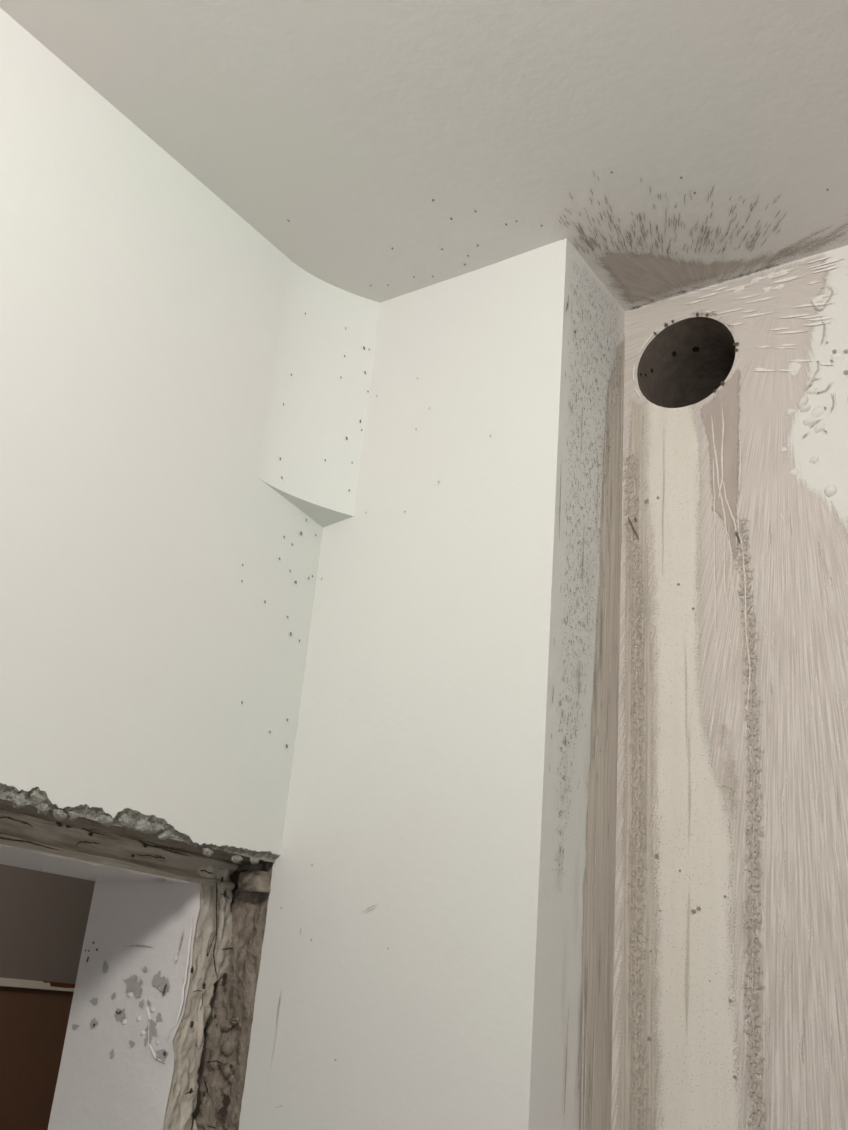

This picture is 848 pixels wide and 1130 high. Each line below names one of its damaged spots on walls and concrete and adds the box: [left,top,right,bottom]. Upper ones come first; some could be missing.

peeling [0,783,279,1130]
leakage [549,171,848,1130]
flaking render [611,252,848,1130]